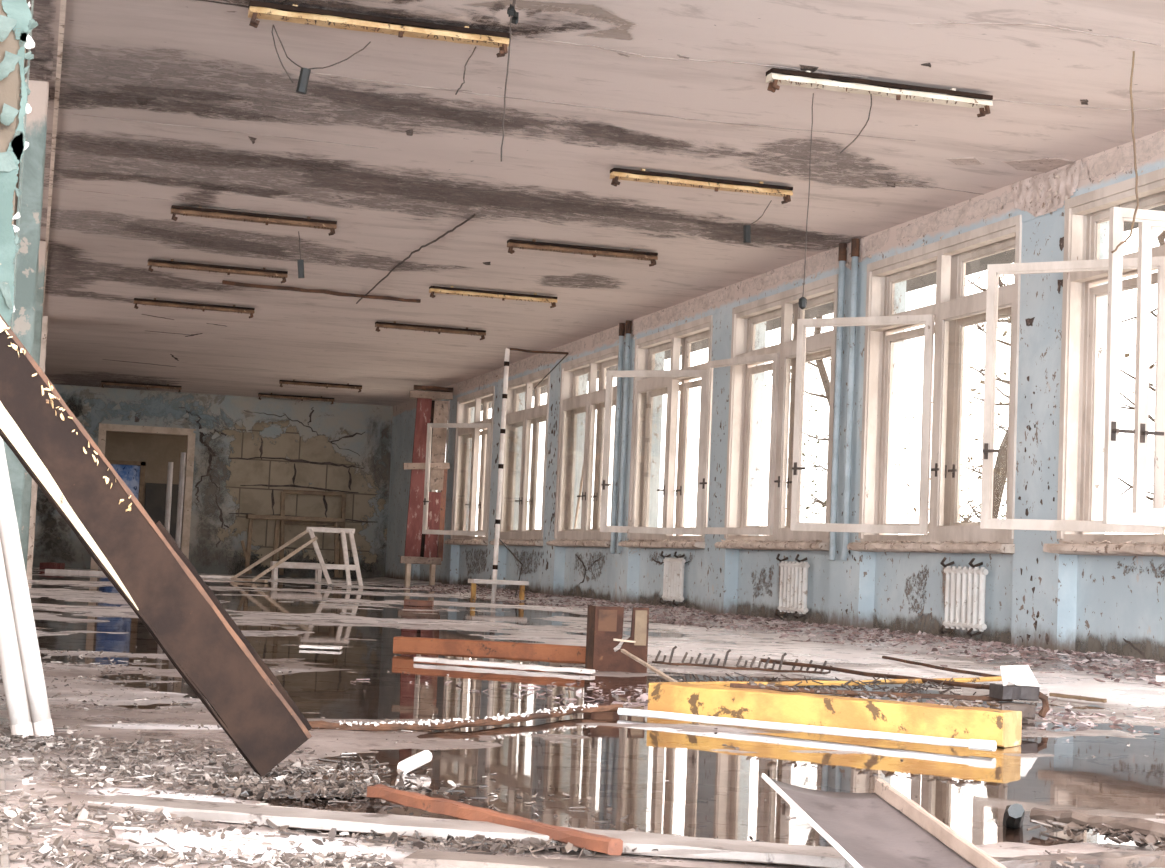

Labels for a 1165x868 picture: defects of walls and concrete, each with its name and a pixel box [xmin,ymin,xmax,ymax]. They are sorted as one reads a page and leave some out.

peeling [0,0,38,331]
water stain [44,133,860,250]
water stain [25,0,932,188]
spalling [77,392,387,568]
crack [178,407,365,547]